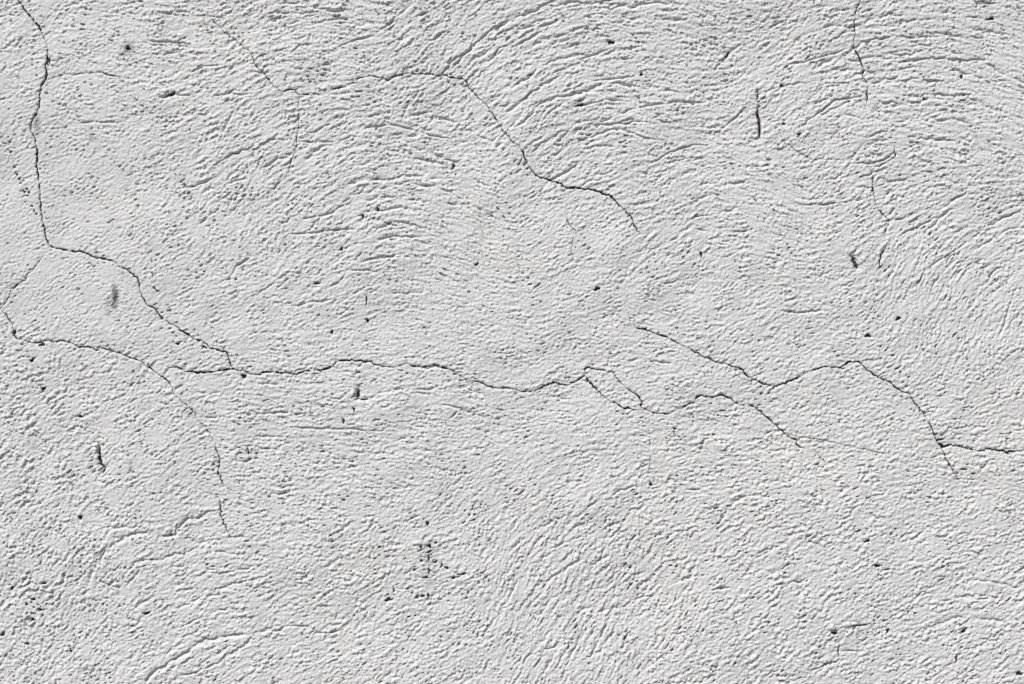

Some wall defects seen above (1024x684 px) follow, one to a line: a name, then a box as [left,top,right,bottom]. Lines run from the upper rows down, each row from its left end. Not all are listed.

crack [1,0,1024,541]